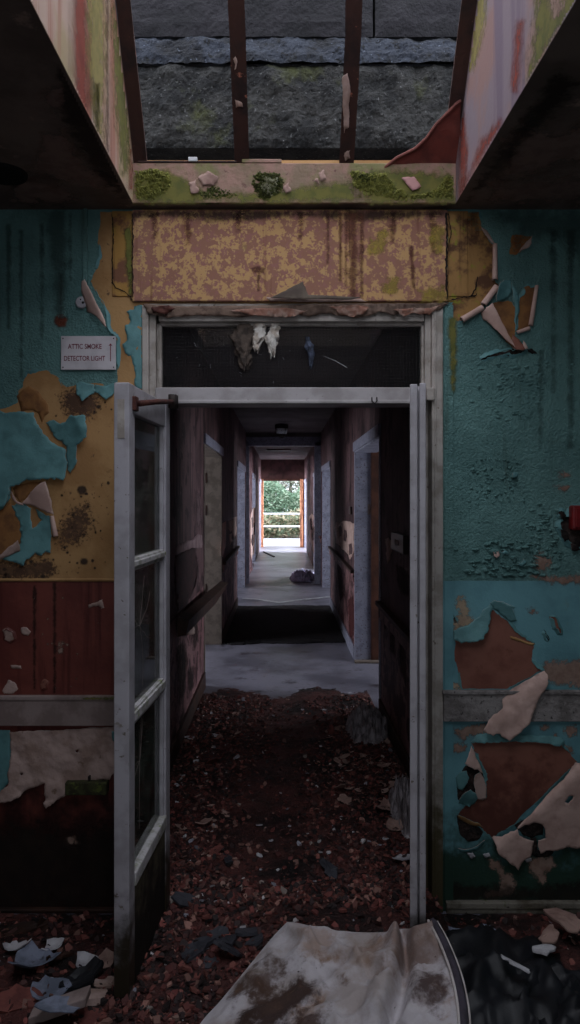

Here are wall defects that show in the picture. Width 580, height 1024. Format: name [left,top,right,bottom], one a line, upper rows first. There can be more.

crack [445,213,478,301]
peeling [447,209,539,350]
peeling [0,212,142,582]
spalling [555,503,580,551]
peeling [2,626,31,644]
peeling [3,665,22,694]
peeling [453,595,580,893]